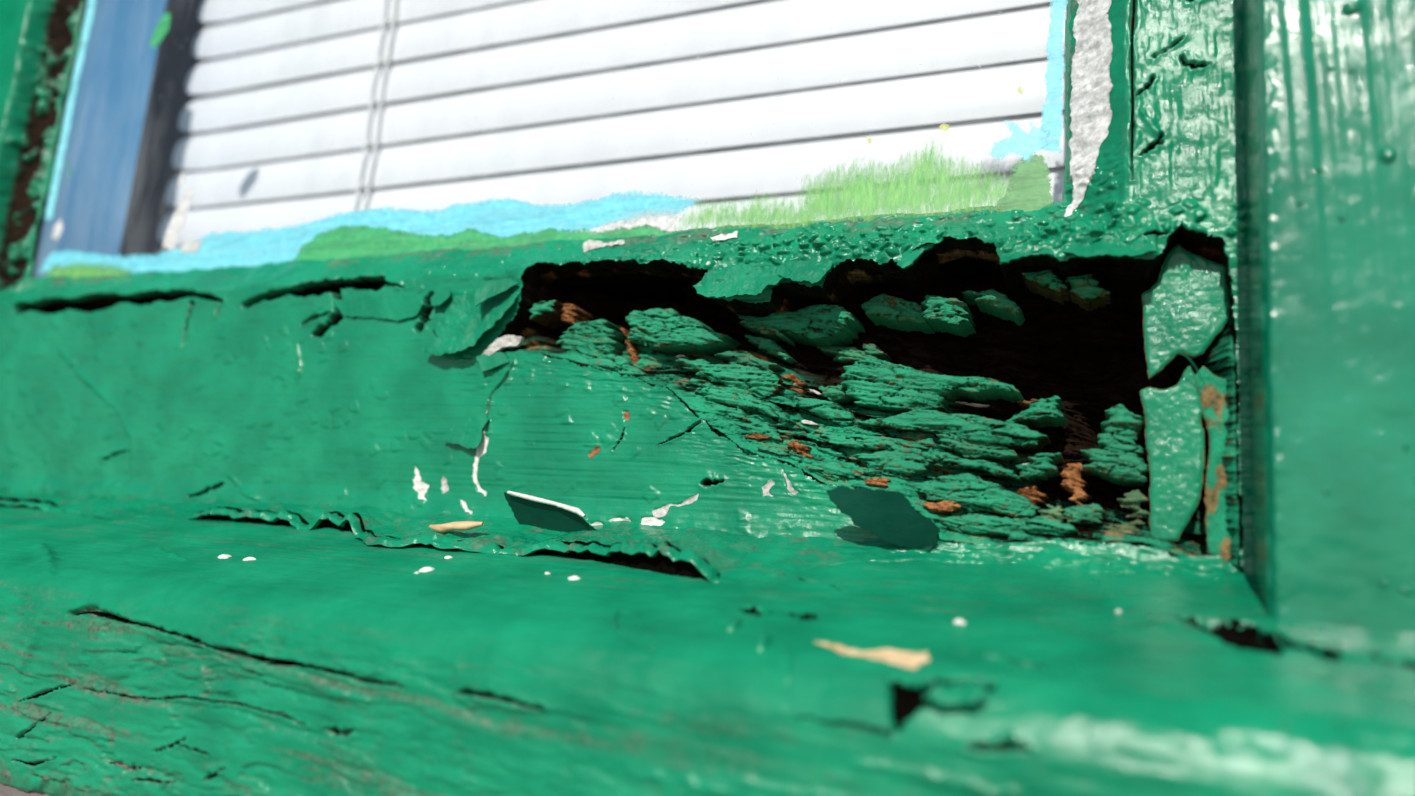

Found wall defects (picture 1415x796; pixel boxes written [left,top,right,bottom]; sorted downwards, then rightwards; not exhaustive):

crack [1130,0,1211,174]
crack [40,295,224,326]
crack [283,277,434,329]
spalling [331,235,1241,572]
crack [109,739,226,784]
crack [15,684,353,766]
crack [76,611,402,686]
crack [461,691,548,712]
peeling [785,642,996,730]